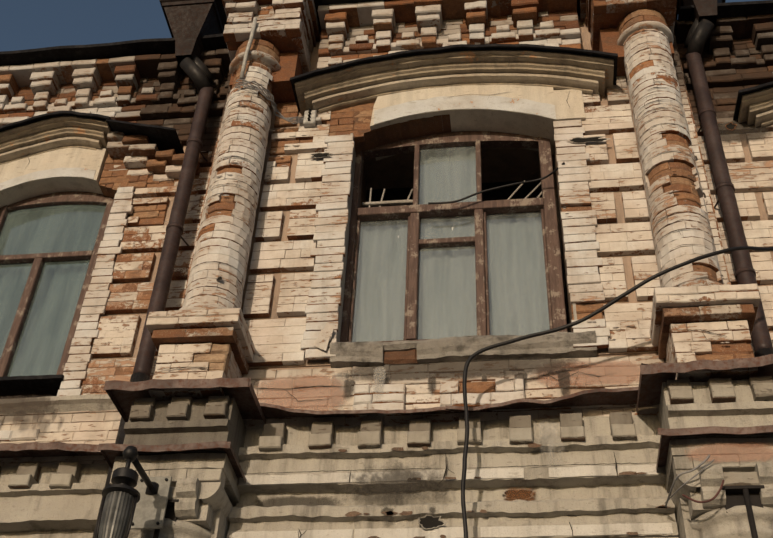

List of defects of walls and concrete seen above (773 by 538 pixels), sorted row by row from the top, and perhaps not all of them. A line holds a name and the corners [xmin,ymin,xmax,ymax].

spalling [227,60,313,168]
spalling [660,132,689,149]
spalling [99,131,185,198]
spalling [645,156,706,208]
spalling [130,202,169,226]
spalling [208,195,235,218]
spalling [692,264,723,282]